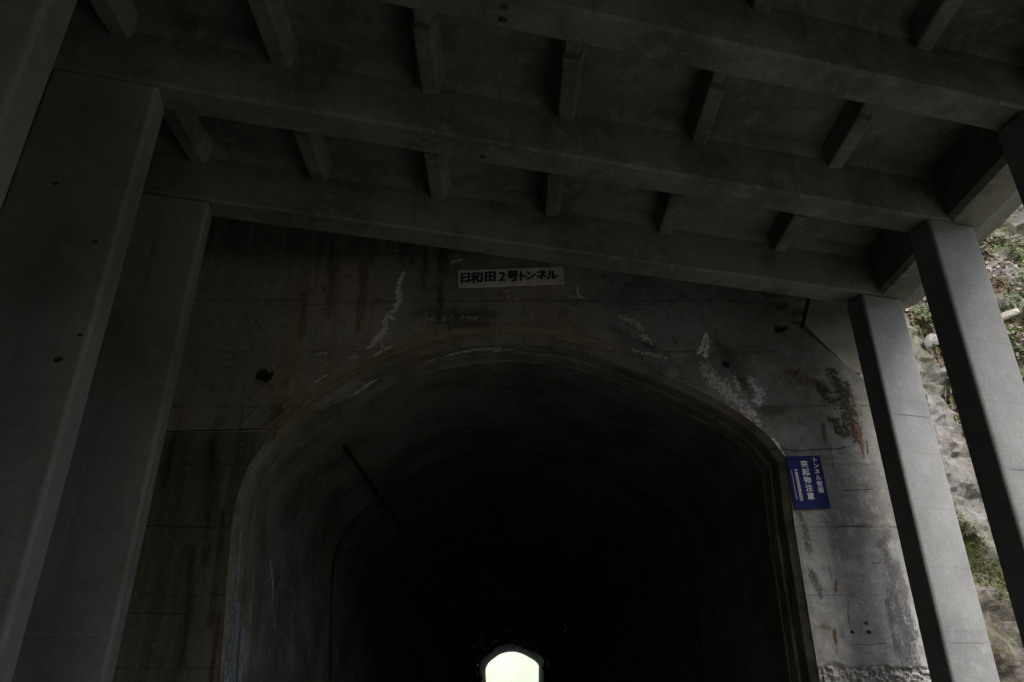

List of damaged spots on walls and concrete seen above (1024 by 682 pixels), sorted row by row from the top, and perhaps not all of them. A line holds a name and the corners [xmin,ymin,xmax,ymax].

water stain [367,271,406,357]
water stain [696,286,767,428]